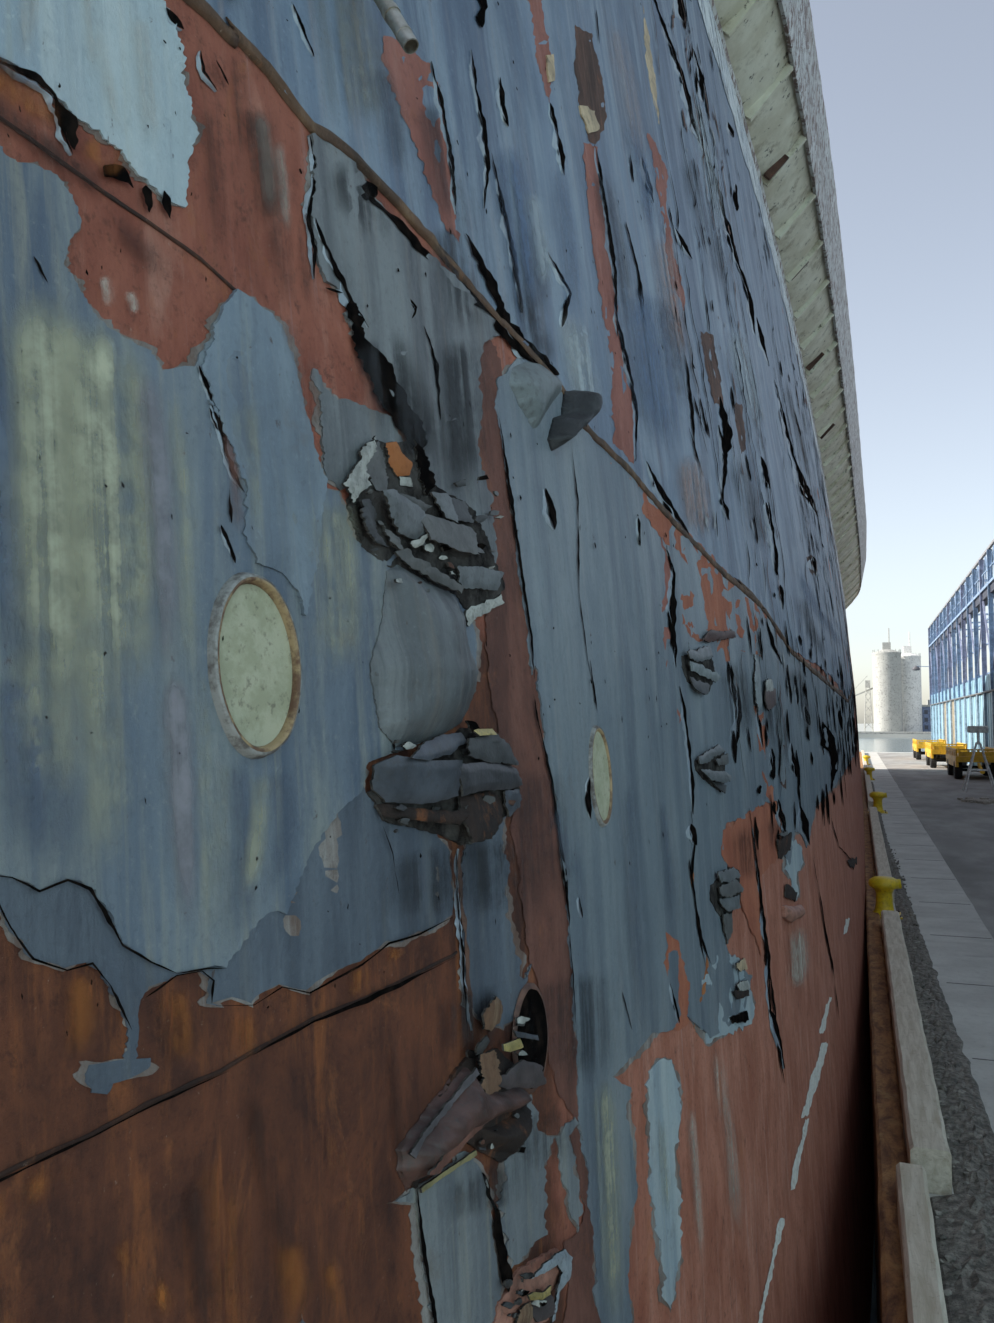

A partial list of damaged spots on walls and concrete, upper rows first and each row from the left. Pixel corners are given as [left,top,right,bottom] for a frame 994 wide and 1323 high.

peeling [0,0,206,208]
crack [430,0,572,376]
peeling [0,105,855,1323]
crack [548,0,860,1083]
crack [0,1072,226,1182]
crack [0,849,473,1055]